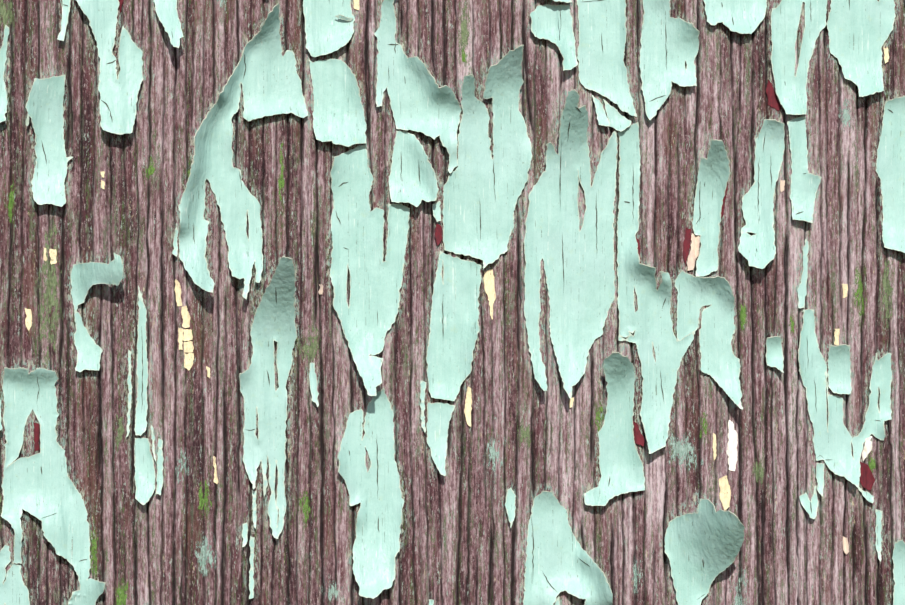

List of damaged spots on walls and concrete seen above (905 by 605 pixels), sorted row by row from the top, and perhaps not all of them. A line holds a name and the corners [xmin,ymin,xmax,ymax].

peeling [0,25,9,123]
peeling [25,74,73,207]
peeling [57,0,144,135]
peeling [154,0,184,48]
peeling [703,0,905,269]
peeling [70,253,124,372]
peeling [126,285,164,505]
peeling [172,0,745,605]
peeling [765,336,784,373]
peeling [797,239,892,564]
peeling [0,367,105,605]
peeling [892,540,905,605]